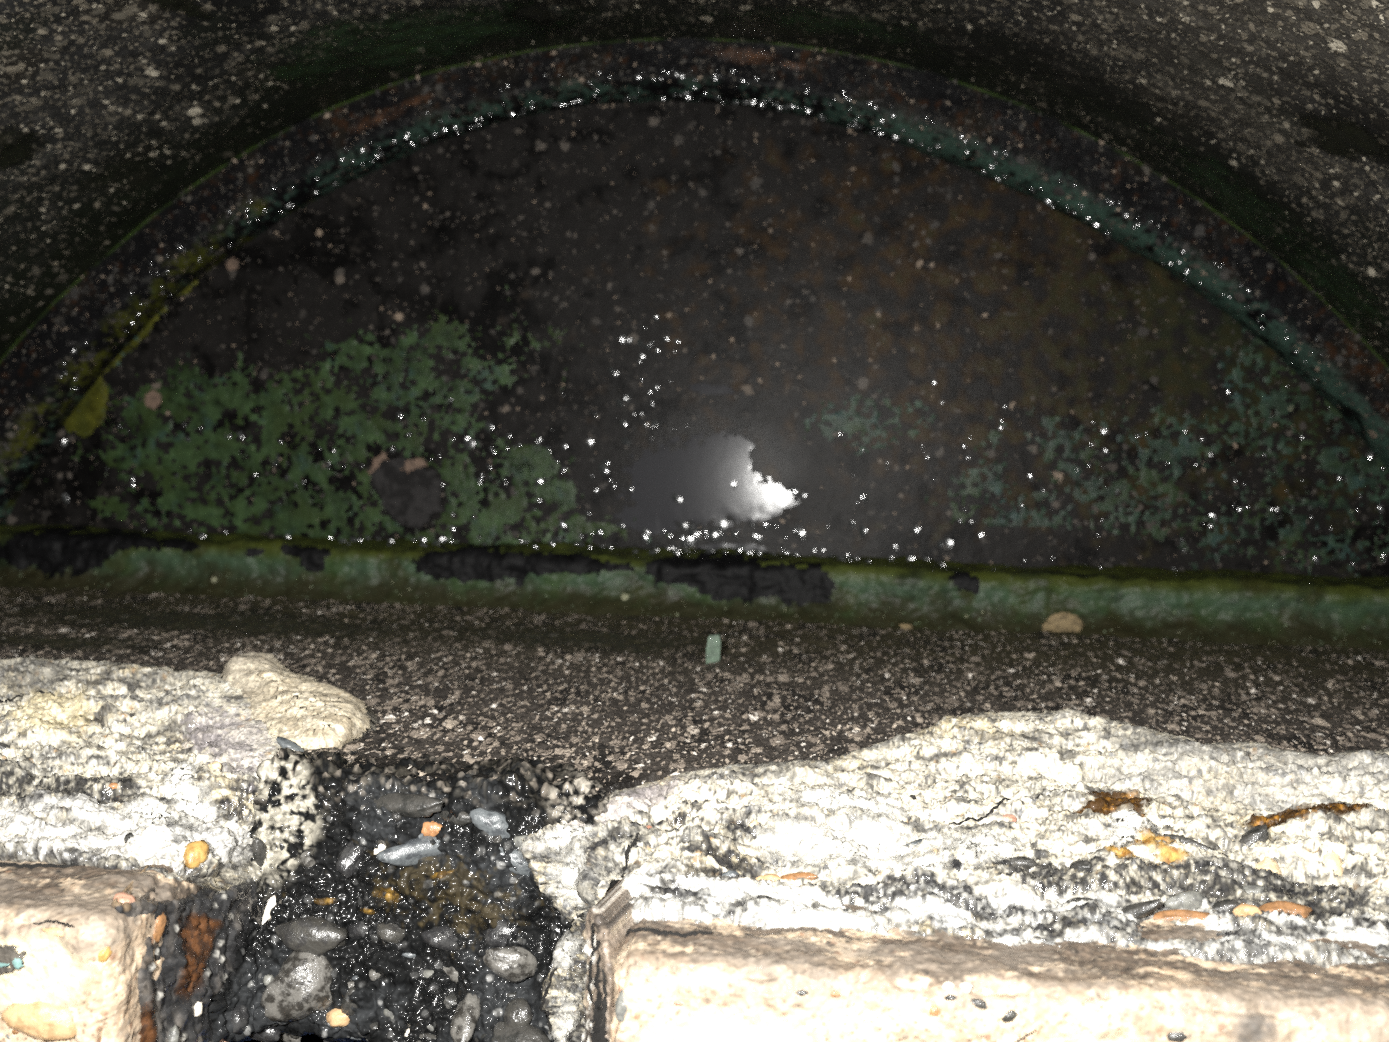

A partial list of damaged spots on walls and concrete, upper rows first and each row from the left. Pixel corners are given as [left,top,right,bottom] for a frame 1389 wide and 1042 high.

spalling [208,747,611,1042]